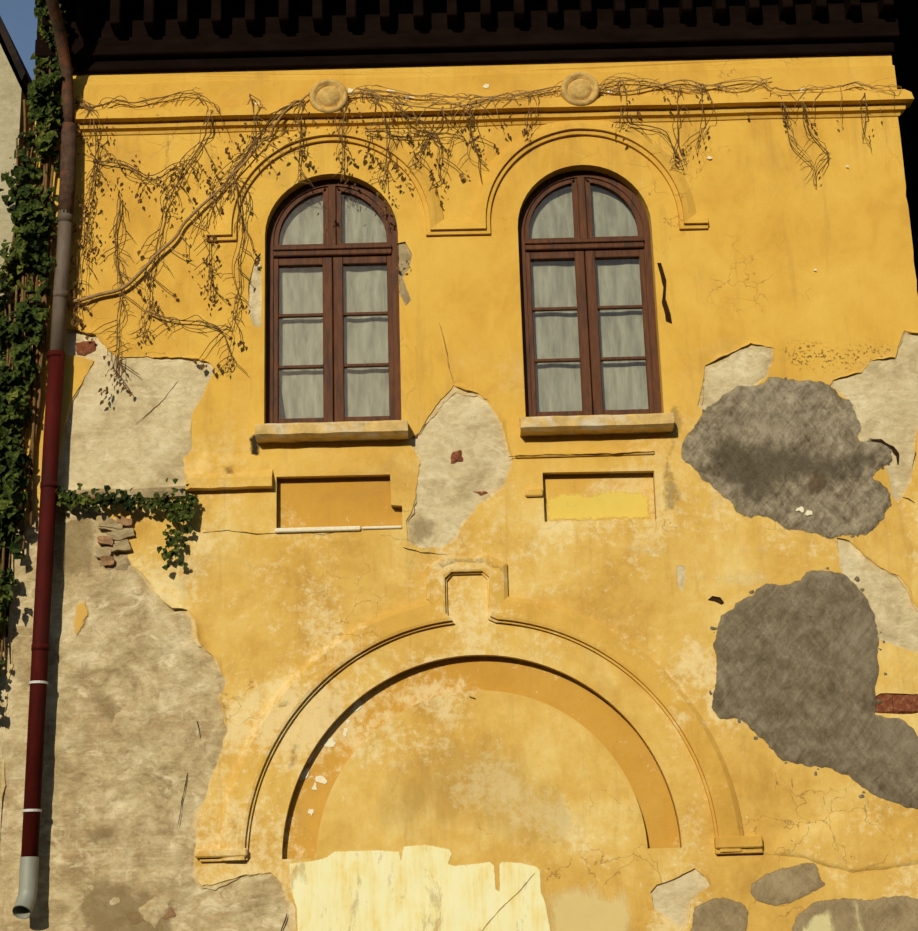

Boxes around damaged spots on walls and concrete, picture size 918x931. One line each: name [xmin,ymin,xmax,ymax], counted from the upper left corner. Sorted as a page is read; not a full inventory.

spalling [249,254,262,328]
spalling [397,243,412,306]
spalling [58,326,217,491]
spalling [697,340,775,411]
spalling [830,329,918,503]
spalling [406,383,513,548]
spalling [837,537,918,653]
spalling [0,502,296,931]
peeling [323,700,362,747]
spalling [875,693,918,714]
peeling [300,753,327,790]
spalling [651,868,711,928]